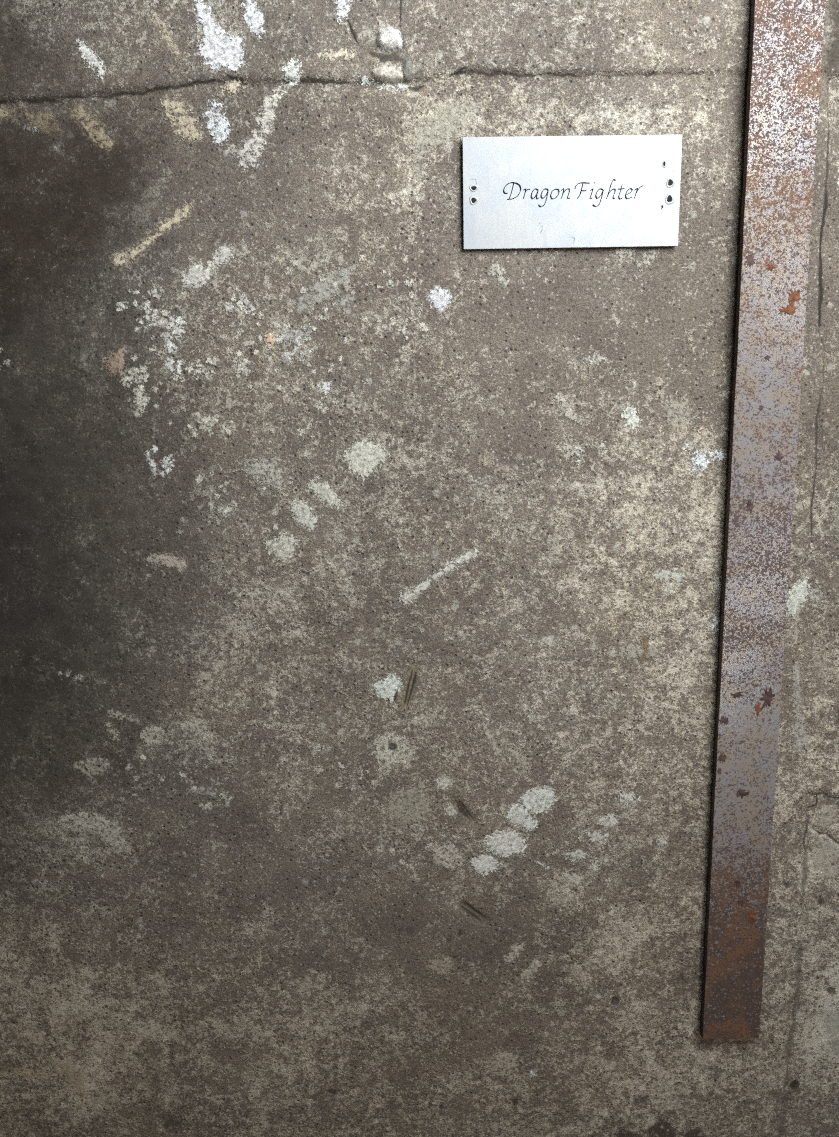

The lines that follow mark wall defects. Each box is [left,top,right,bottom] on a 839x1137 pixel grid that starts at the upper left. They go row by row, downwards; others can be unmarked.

crack [0,74,248,104]
crack [275,66,579,91]
crack [818,123,830,346]
crack [810,382,824,540]
crack [803,792,839,852]